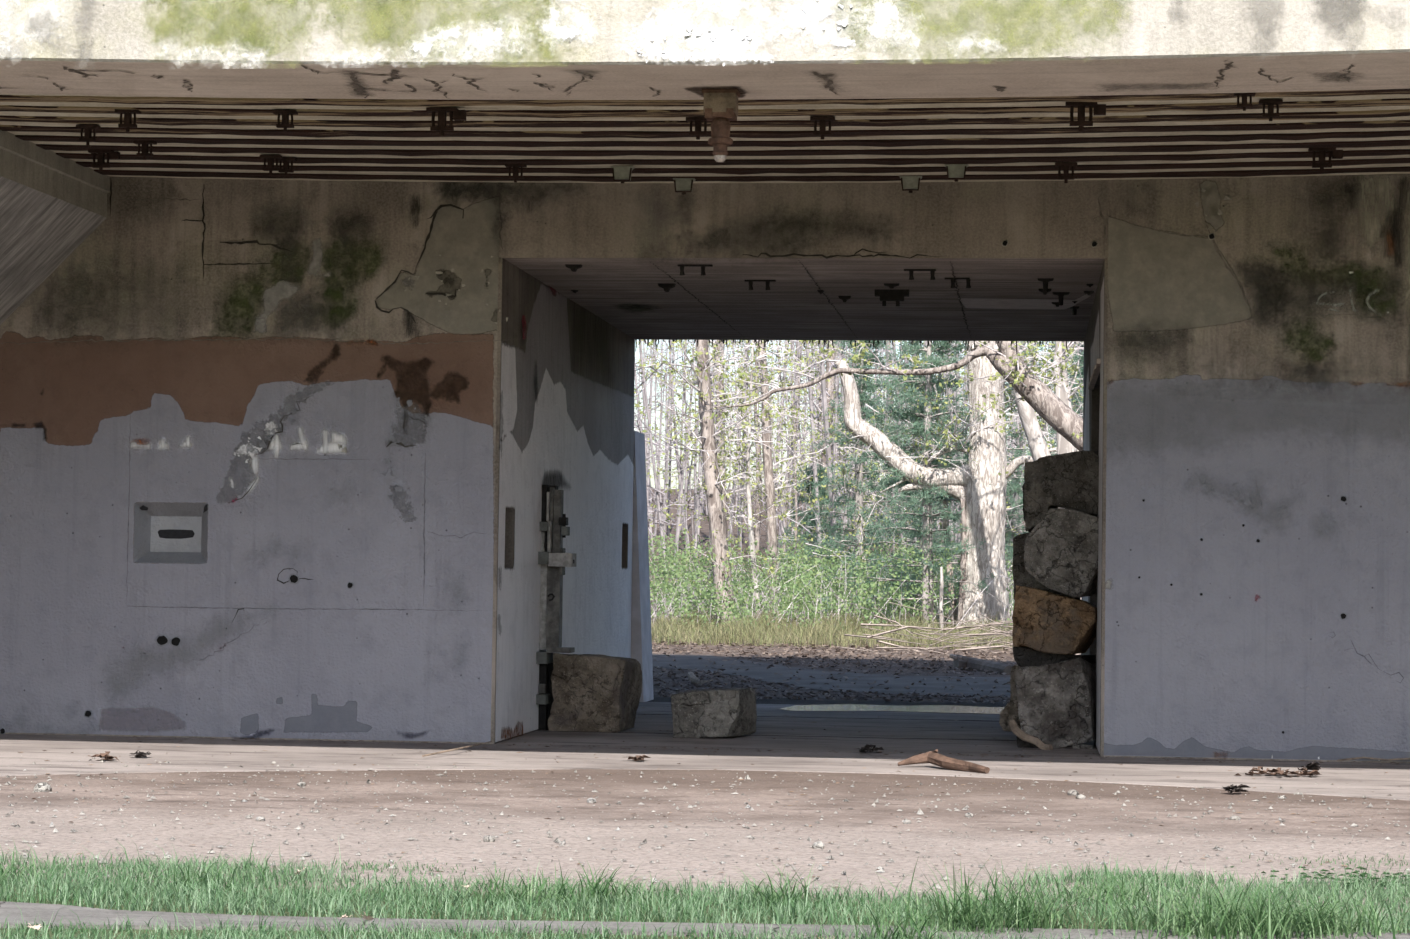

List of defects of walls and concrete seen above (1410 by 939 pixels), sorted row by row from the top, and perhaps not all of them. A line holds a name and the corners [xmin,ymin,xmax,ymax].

peeling [217,384,316,503]